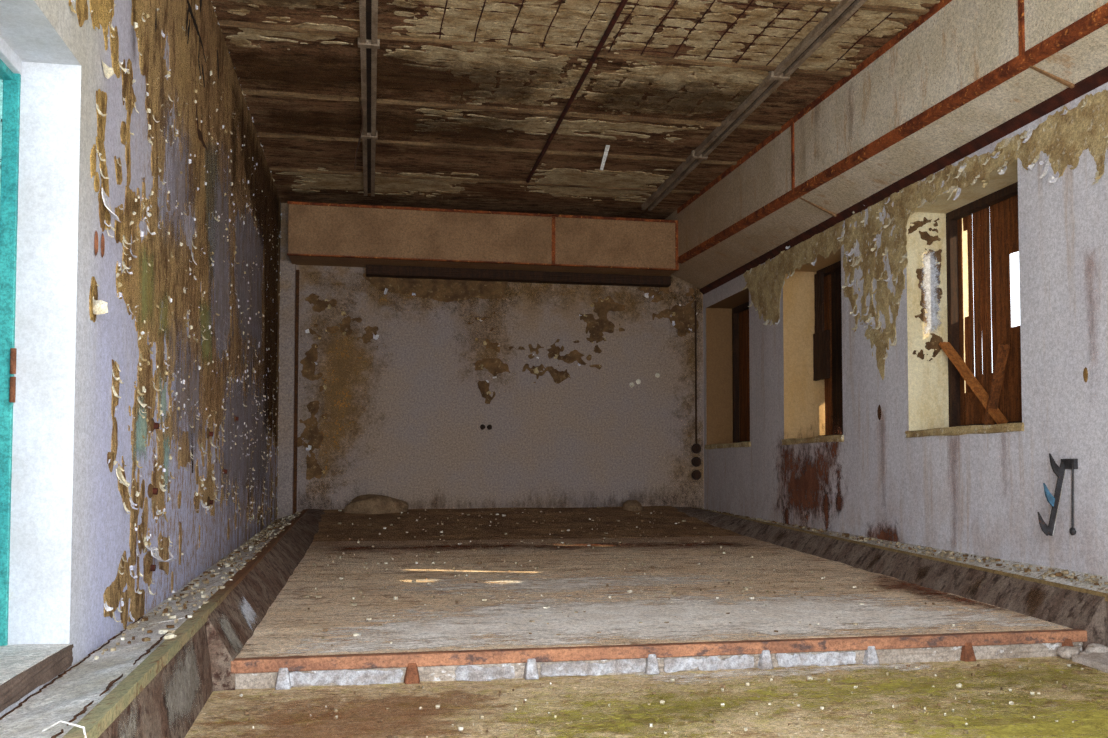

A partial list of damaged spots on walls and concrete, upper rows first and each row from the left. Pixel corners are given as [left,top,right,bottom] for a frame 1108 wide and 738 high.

spalling [392,0,841,116]
water stain [585,79,754,119]
spalling [798,4,907,71]
peeling [69,0,282,629]
peeling [297,293,379,480]
peeling [363,273,508,303]
peeling [468,296,625,404]
peeling [638,286,699,337]
peeling [743,89,1108,380]
corrosion [776,426,843,530]